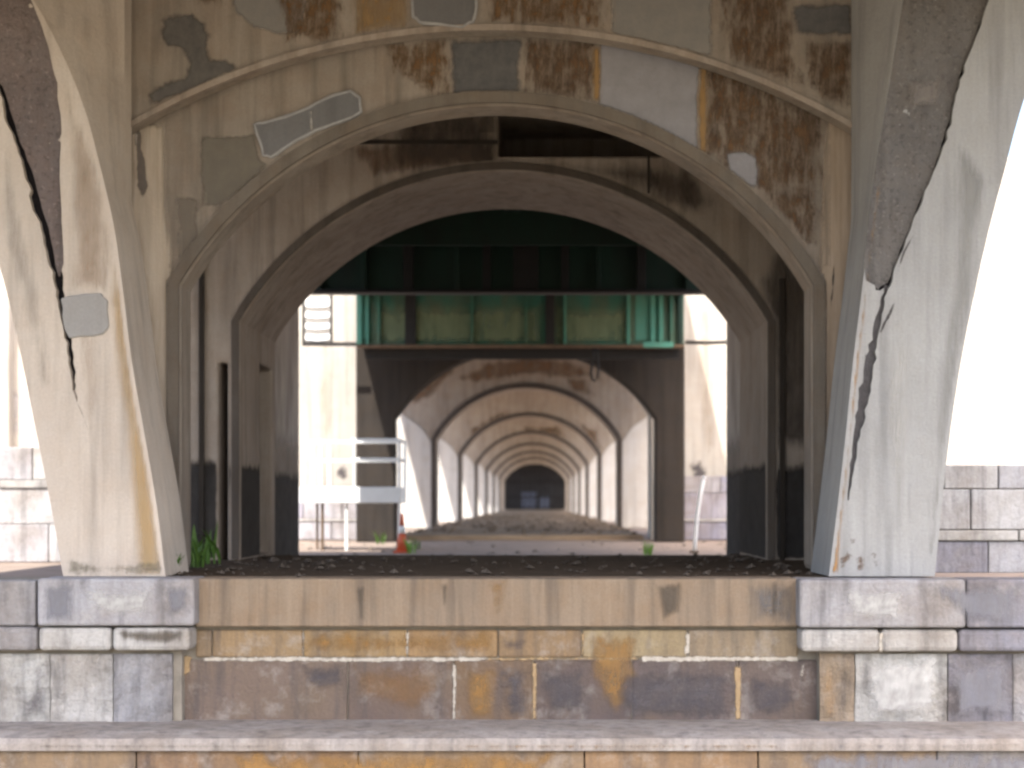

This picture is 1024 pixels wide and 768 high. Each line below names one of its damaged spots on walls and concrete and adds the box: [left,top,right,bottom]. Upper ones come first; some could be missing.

spalling [0,0,64,276]
peeling [149,15,234,102]
rust [391,41,447,91]
rust [525,40,600,100]
rust [699,68,823,243]
spalling [864,0,988,290]
crack [934,69,963,168]
crack [0,84,81,411]
crack [848,198,922,497]
rust [595,638,632,703]